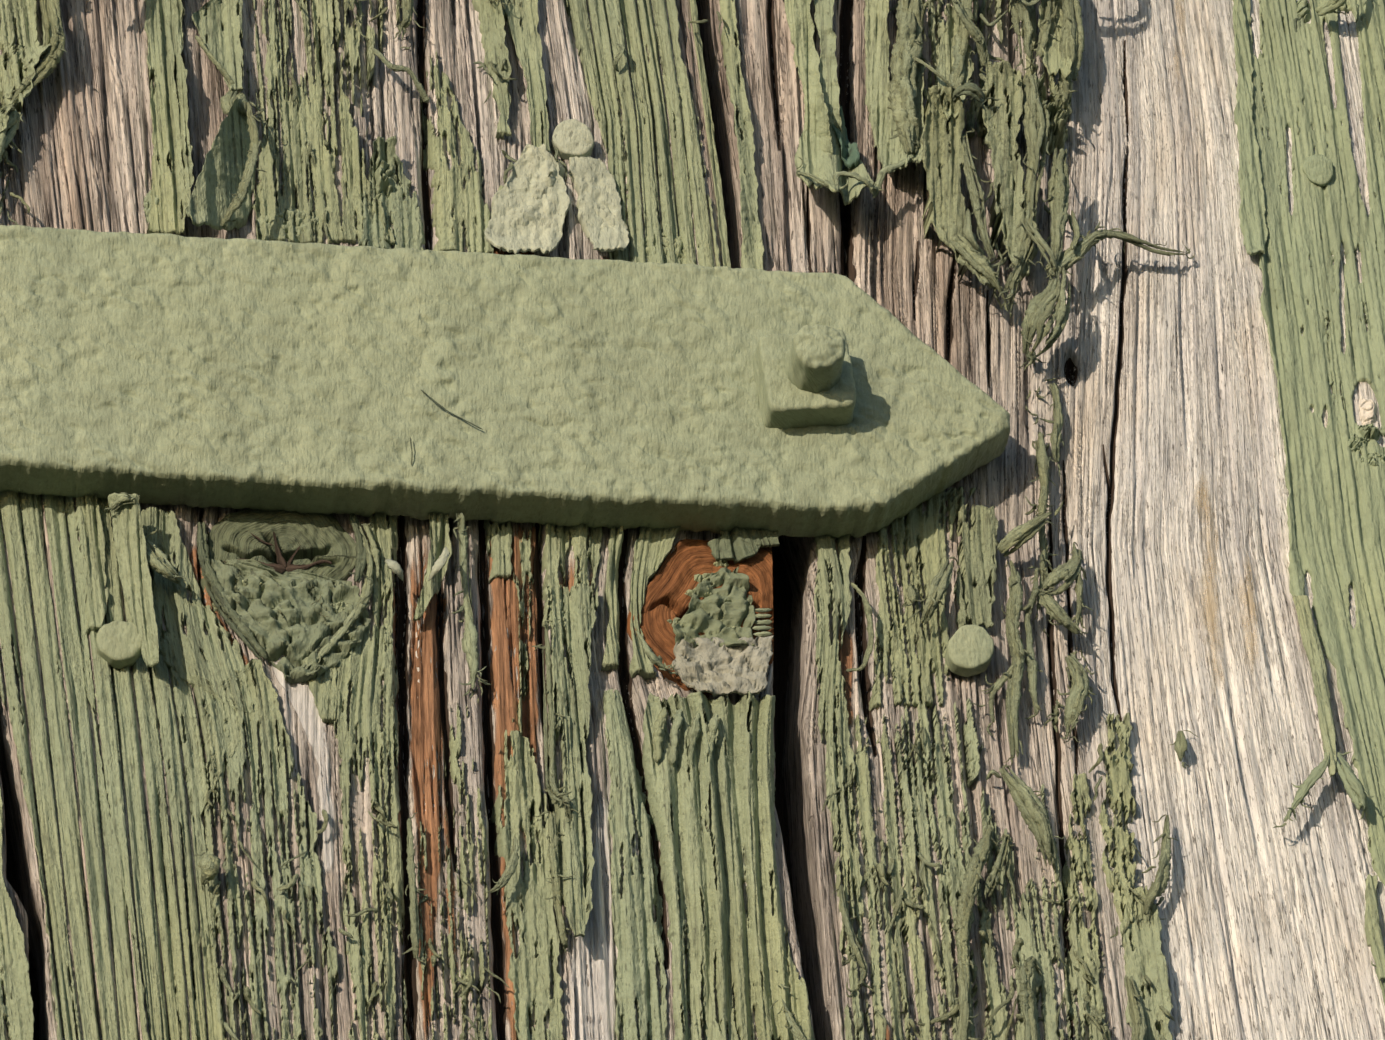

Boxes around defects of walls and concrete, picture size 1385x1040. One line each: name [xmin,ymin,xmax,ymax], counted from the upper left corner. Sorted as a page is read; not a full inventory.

peeling [0,0,67,225]
peeling [143,0,764,270]
crack [806,185,856,282]
crack [839,0,853,142]
peeling [784,0,1198,1040]
peeling [1232,0,1385,1005]
peeling [0,490,815,1040]